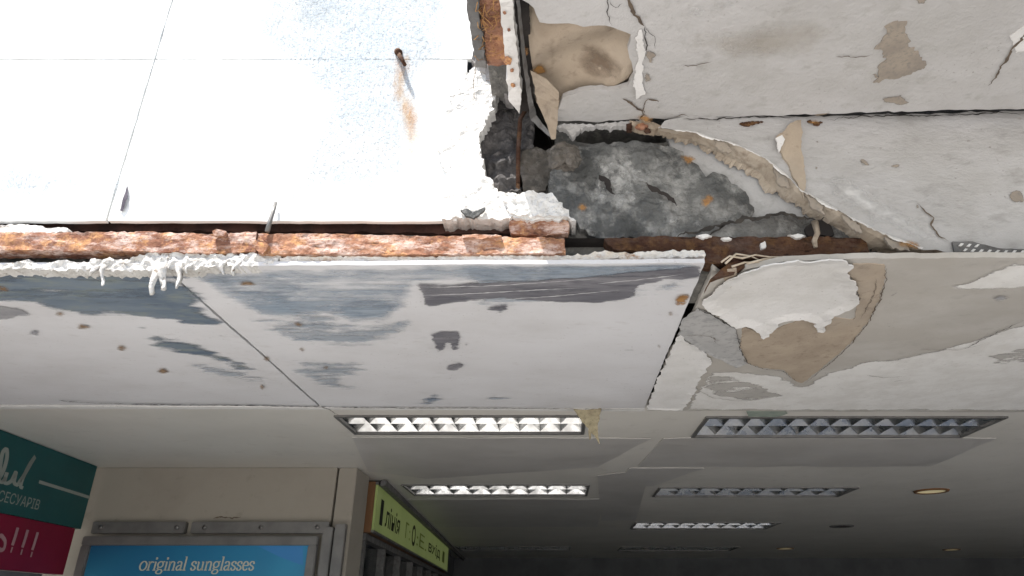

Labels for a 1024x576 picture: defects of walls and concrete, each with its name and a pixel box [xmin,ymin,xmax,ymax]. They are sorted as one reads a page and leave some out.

crack [989,36,1024,85]
spalling [481,0,927,253]
crack [623,99,790,120]
crack [835,112,1022,120]
efflorescence [0,224,72,233]
peeling [462,234,502,242]
efflorescence [0,250,706,295]
peeling [209,259,859,411]